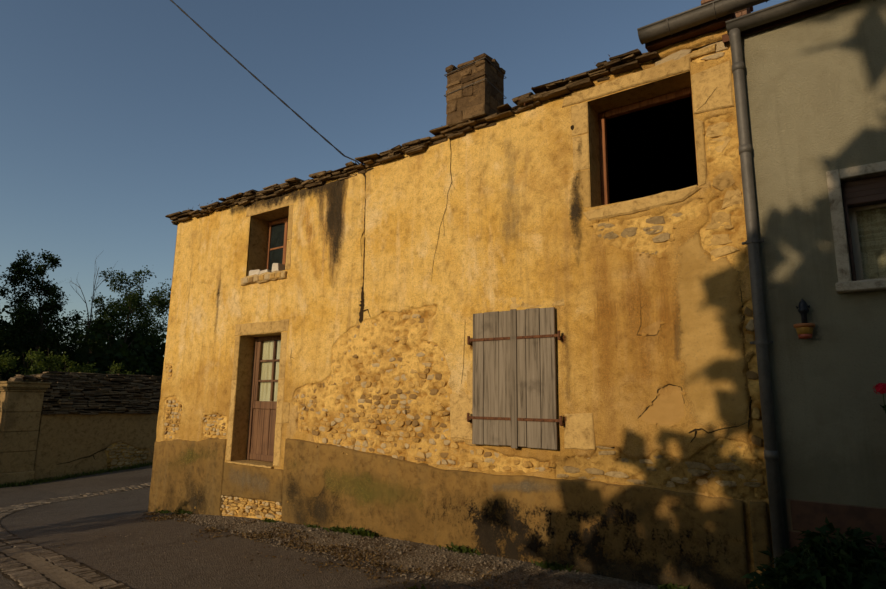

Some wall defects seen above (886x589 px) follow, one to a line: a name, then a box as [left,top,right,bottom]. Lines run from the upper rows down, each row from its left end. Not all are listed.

water stain [231,179,345,267]
crack [355,162,373,323]
crack [431,139,455,280]
water stain [570,179,581,242]
flaking render [589,197,710,258]
flaking render [162,396,182,440]
flaking render [201,412,228,438]
flaking render [292,300,768,501]
crack [638,384,684,418]
crack [689,396,752,443]
water stain [432,500,748,589]